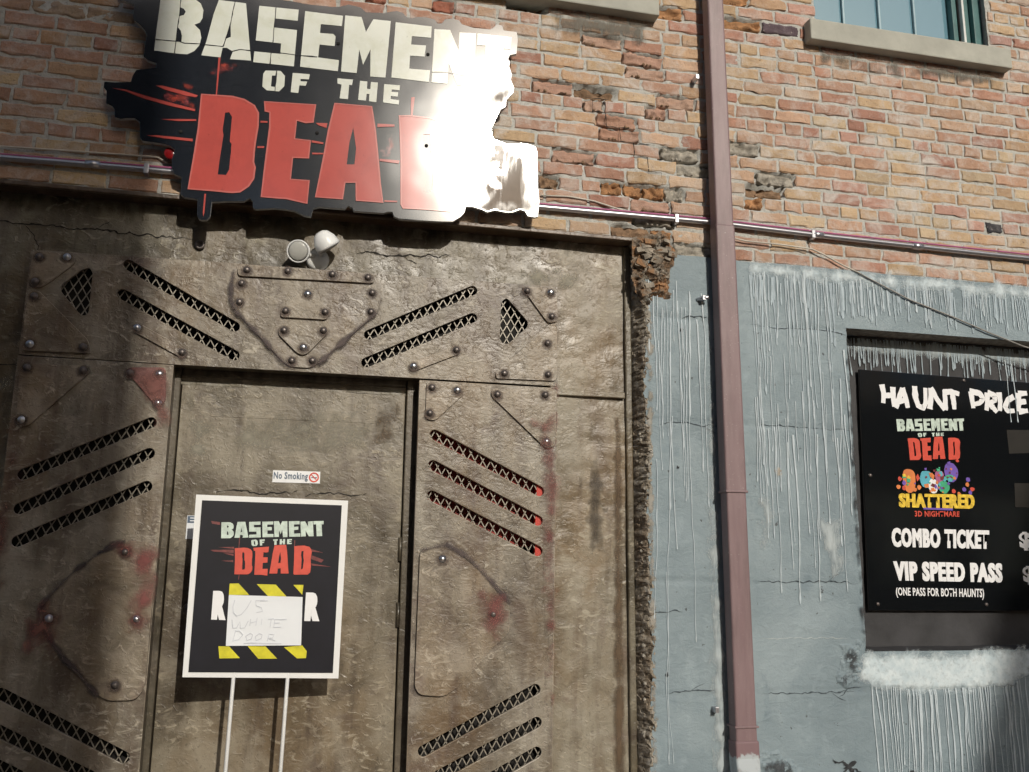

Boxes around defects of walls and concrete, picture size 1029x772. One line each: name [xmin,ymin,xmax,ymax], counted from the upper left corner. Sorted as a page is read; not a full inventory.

spalling [532,81,694,145]
spalling [538,176,558,190]
spalling [551,150,594,166]
spalling [659,148,709,179]
crack [0,220,194,250]
crack [357,251,449,264]
water stain [749,271,1029,604]
spalling [600,183,682,772]
water stain [648,281,710,761]
spalling [835,639,864,689]